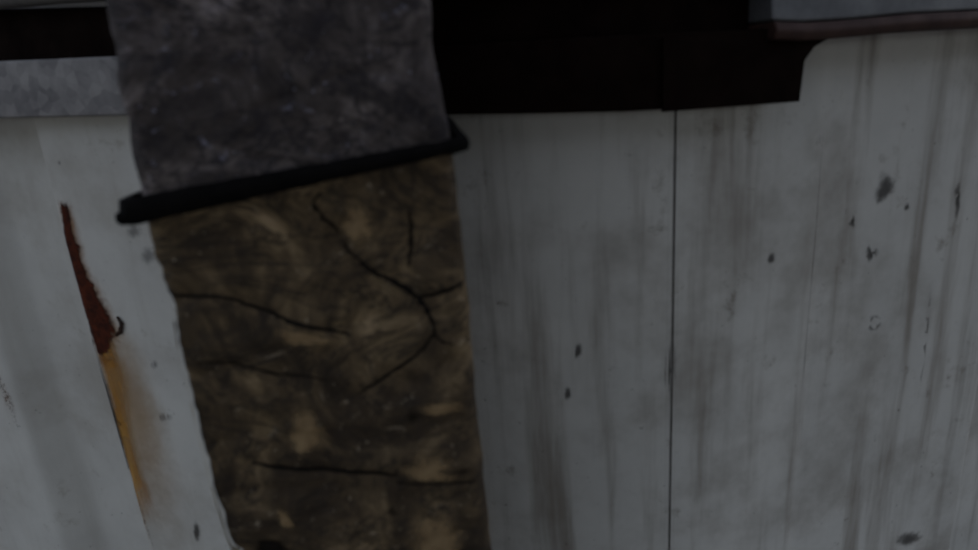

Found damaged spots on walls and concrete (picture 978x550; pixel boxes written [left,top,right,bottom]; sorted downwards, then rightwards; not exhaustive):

corrosion [60,204,146,502]